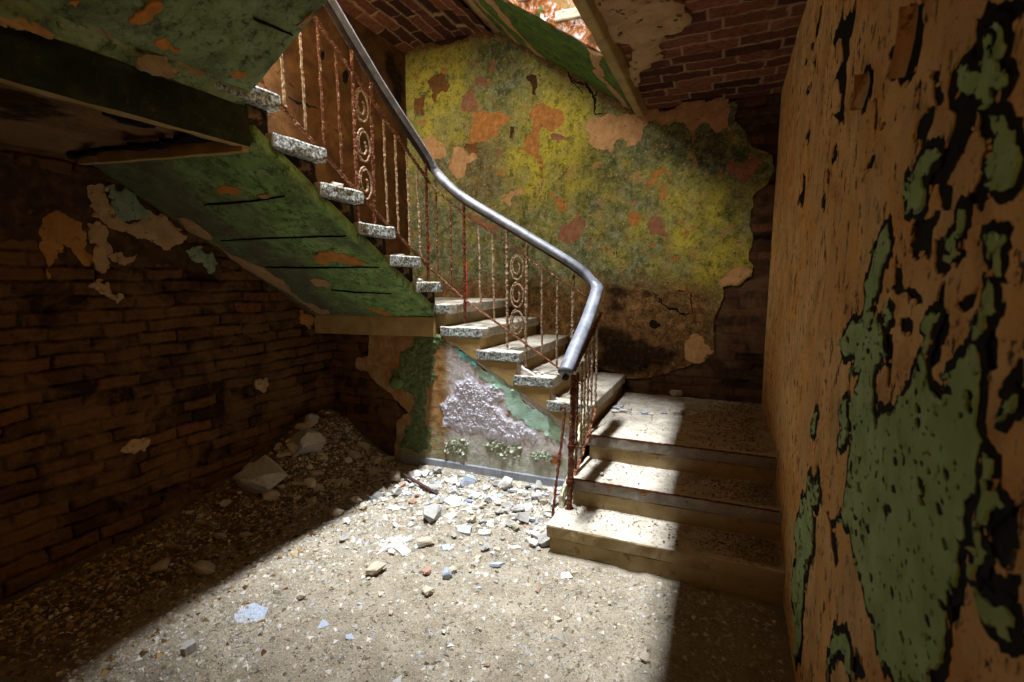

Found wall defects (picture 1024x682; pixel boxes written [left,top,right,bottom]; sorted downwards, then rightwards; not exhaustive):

peeling [0,17,56,40]
peeling [134,37,210,79]
peeling [585,97,730,152]
peeling [177,217,331,329]
water stain [608,287,627,310]
crack [658,290,693,316]
water stain [598,327,677,373]
peeling [684,333,714,364]
peeling [836,3,1024,682]
peeling [391,334,566,464]
peeling [790,466,822,672]
peeling [825,619,866,682]